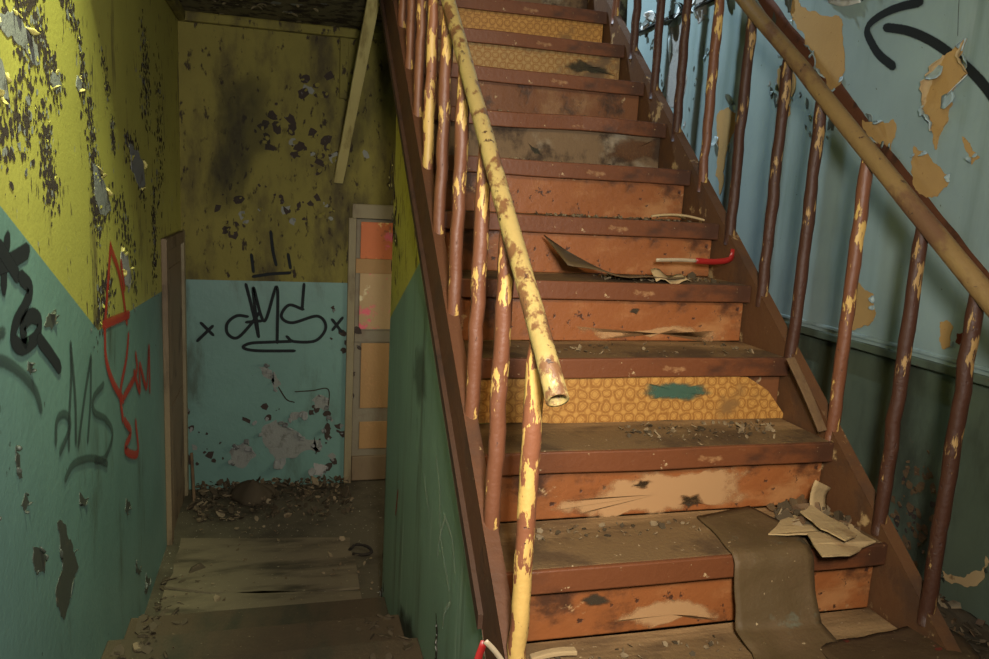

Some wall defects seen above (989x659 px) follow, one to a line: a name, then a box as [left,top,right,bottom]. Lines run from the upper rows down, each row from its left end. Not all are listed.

peeling [785,0,863,92]
peeling [0,0,165,348]
peeling [910,38,968,198]
peeling [962,137,980,165]
peeling [330,326,362,354]
peeling [15,445,23,479]
peeling [188,394,344,477]
peeling [32,520,79,620]